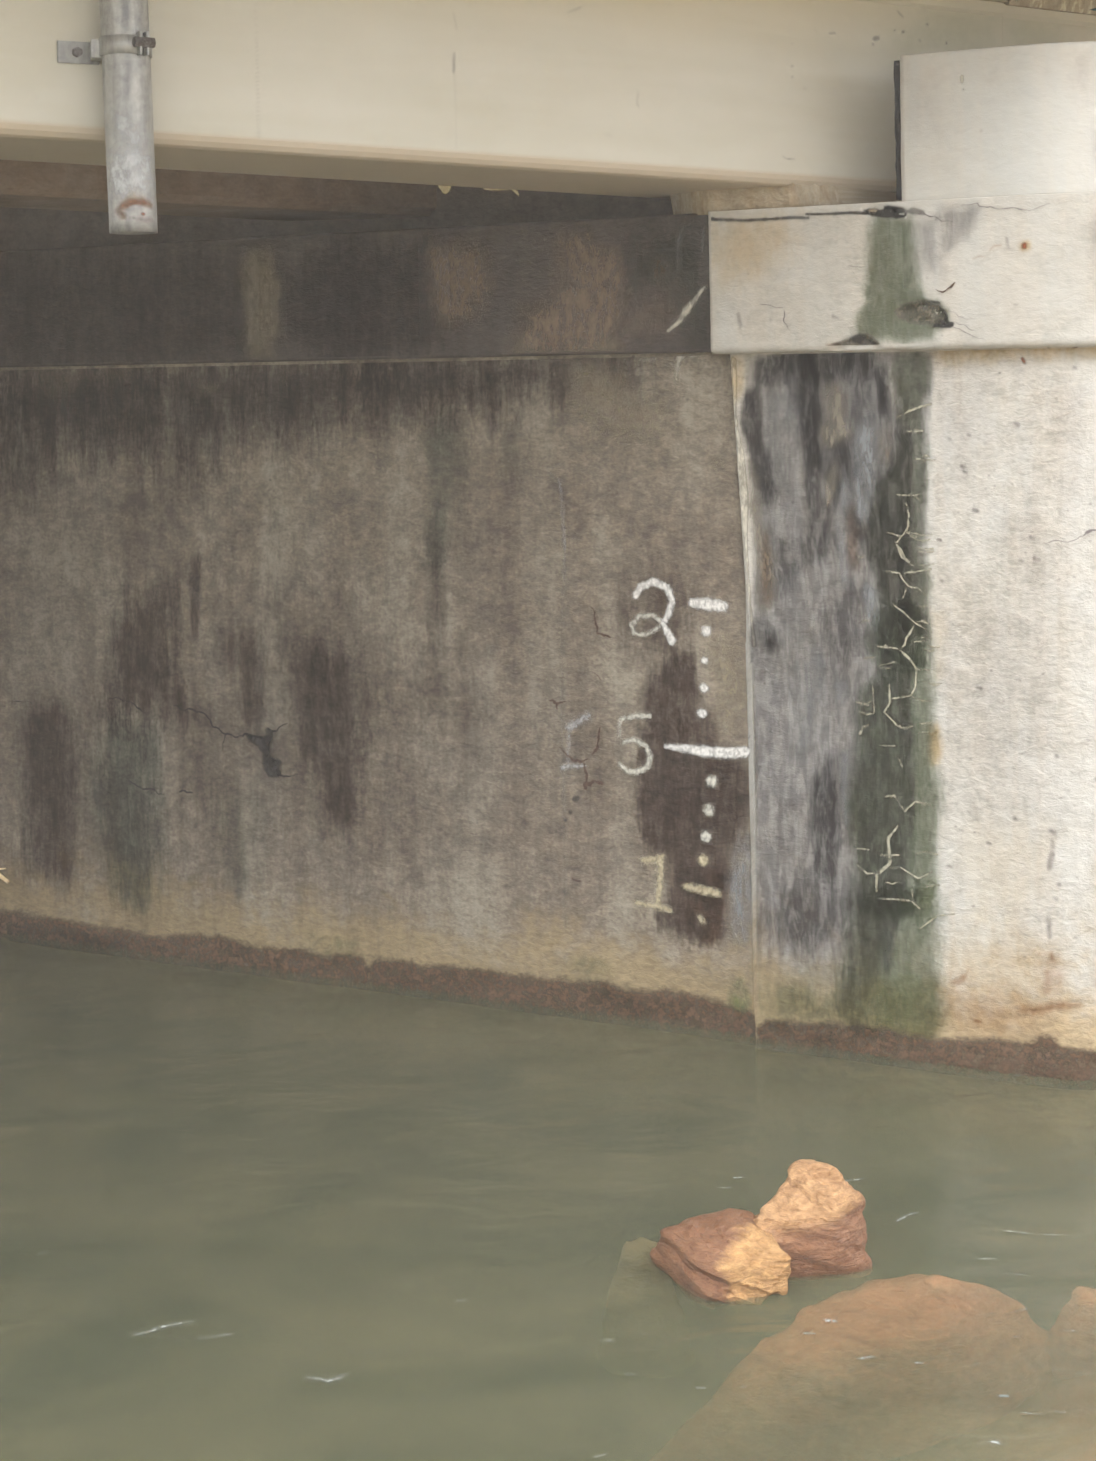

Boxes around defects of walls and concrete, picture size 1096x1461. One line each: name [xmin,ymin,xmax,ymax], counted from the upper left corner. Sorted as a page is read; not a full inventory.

crack [711,211,869,222]
crack [917,203,1050,222]
damp [667,287,705,332]
spalling [896,301,983,339]
damp [801,357,888,517]
damp [731,357,774,647]
crack [1046,529,1096,544]
crack [857,403,953,929]
crack [112,697,298,777]
damp [0,587,1096,1090]